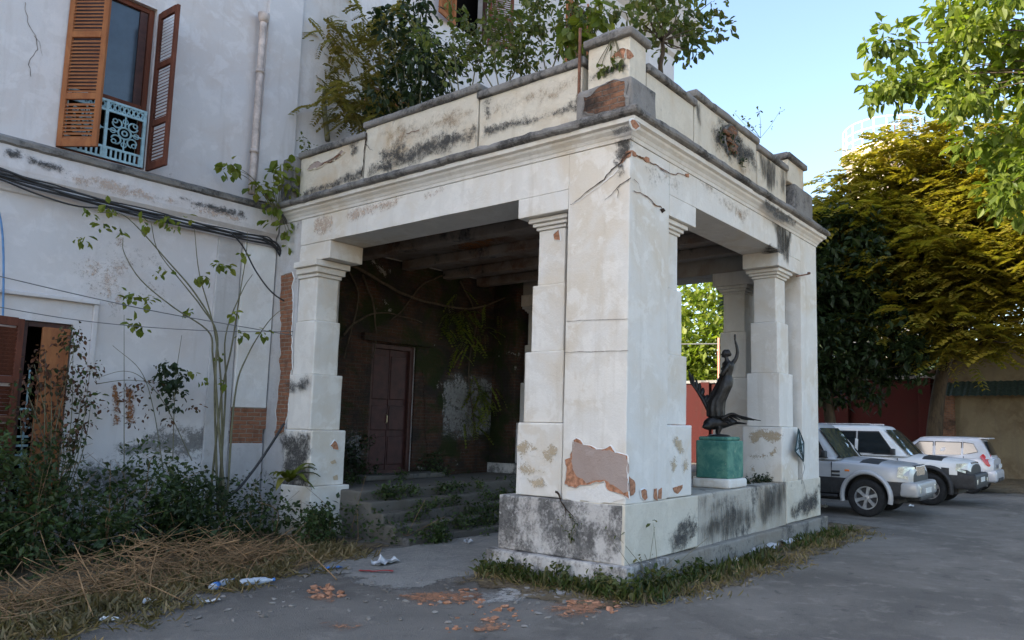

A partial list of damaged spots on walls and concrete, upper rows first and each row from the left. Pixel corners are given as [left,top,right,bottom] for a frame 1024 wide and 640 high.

crack [25,2,42,76]
flaking render [583,79,640,131]
damp [303,100,538,196]
crack [570,150,689,213]
damp [714,119,796,259]
flaking render [259,272,295,436]
flaking render [516,438,683,503]
damp [672,486,819,553]